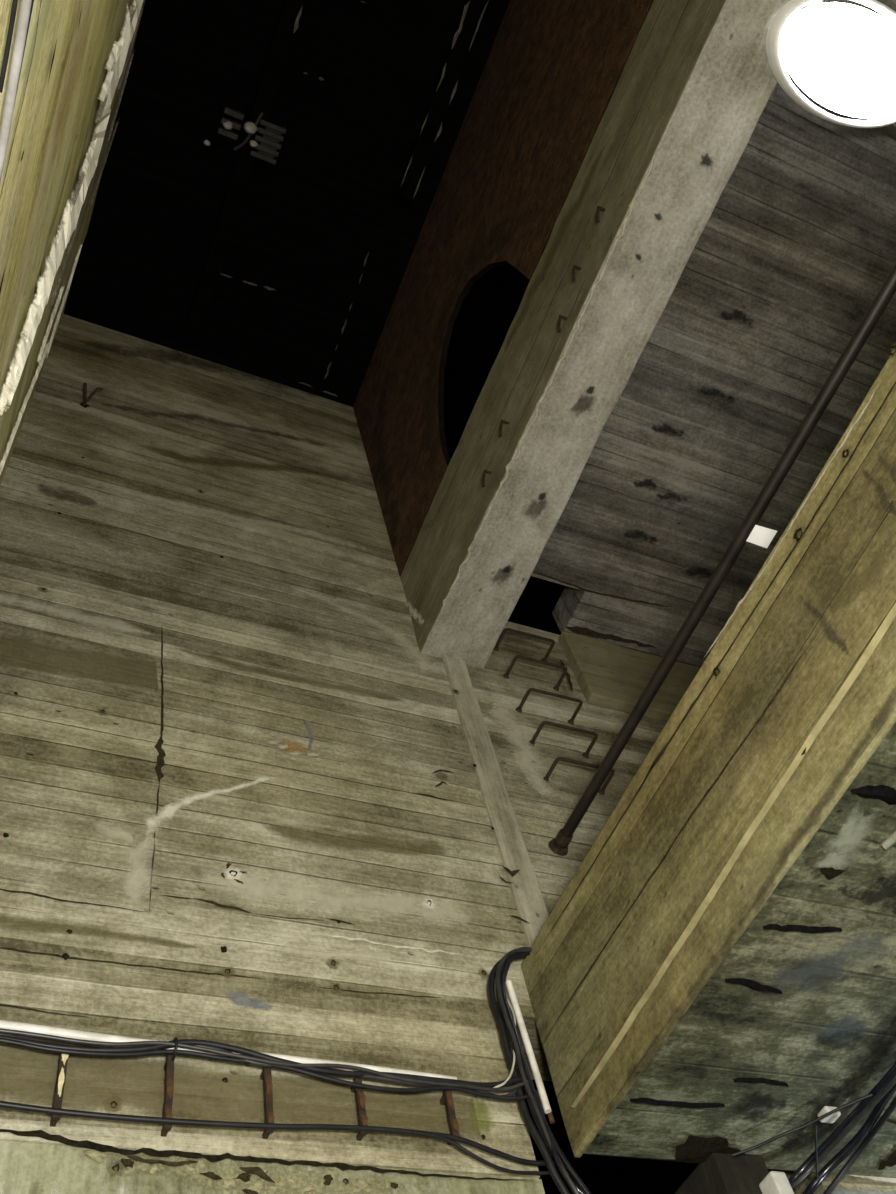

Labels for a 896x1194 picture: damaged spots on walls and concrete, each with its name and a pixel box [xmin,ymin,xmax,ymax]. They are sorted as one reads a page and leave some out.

peeling [0,0,145,474]
crack [0,626,355,925]
damp [100,778,270,899]
spalling [83,1150,404,1194]